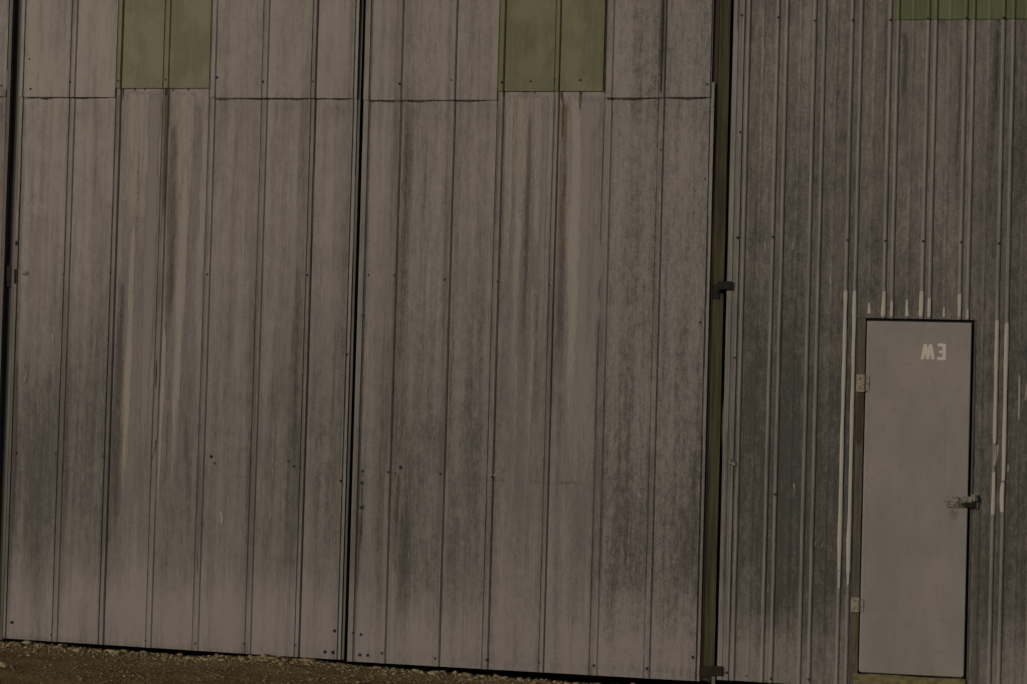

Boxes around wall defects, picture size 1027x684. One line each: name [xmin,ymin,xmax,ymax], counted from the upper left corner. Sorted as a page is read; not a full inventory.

water stain [113,88,201,516]
water stain [493,0,707,621]